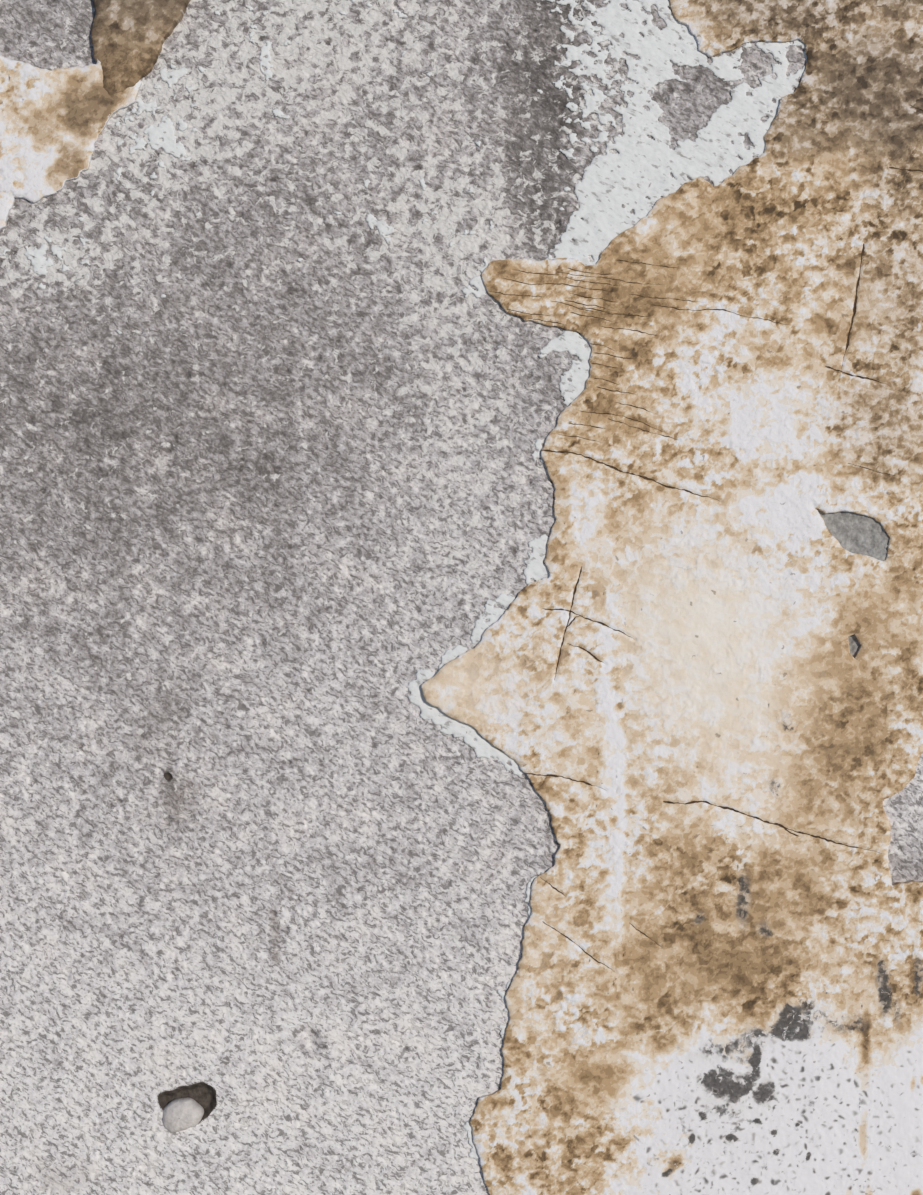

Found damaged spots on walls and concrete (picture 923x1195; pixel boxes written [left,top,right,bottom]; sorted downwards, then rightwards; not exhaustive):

damp [2,61,136,194]
flaking render [537,0,807,266]
crack [826,244,886,384]
flaking render [0,0,592,1195]
crack [545,567,632,677]
crack [542,450,719,501]
damp [470,0,923,1157]
flaking render [817,509,889,561]
crack [524,773,605,790]
crack [663,801,882,854]
spalling [883,753,923,884]
damp [747,1175,762,1187]